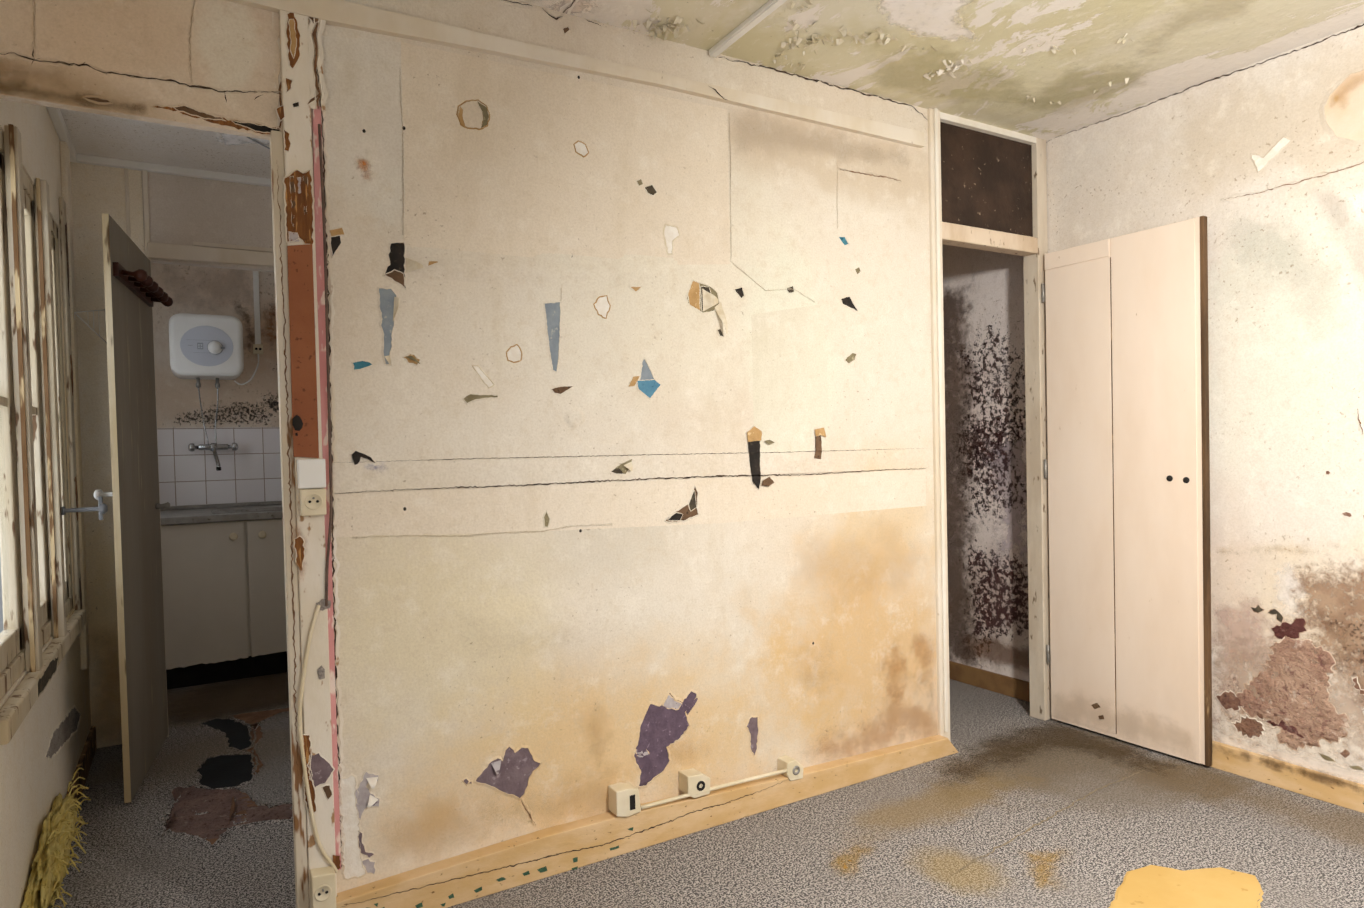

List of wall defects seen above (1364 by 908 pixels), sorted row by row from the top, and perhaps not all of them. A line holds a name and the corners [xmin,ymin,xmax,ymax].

crack [476,0,601,26]
crack [0,49,282,102]
peeling [218,12,320,152]
peeling [282,169,315,246]
damp [174,390,279,428]
damp [943,291,1029,671]
spalling [1215,604,1364,770]
damp [1216,569,1364,783]
peeling [461,744,543,800]
peeling [631,689,698,789]